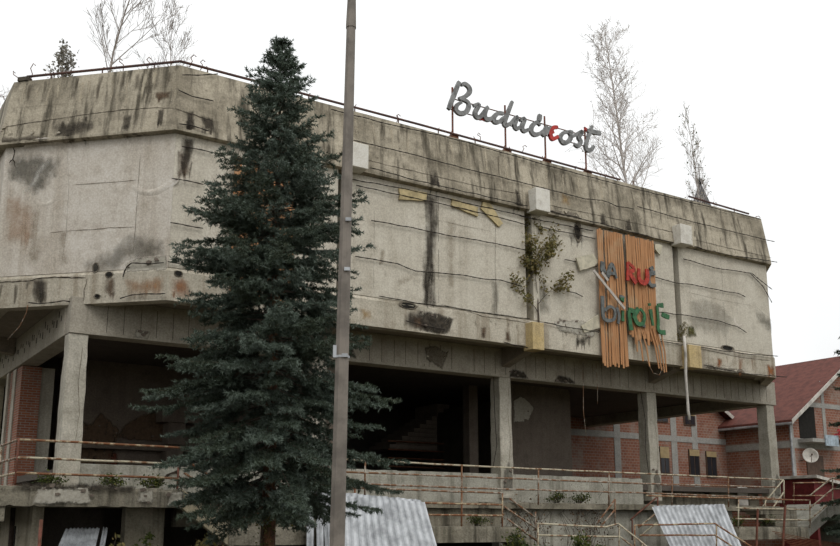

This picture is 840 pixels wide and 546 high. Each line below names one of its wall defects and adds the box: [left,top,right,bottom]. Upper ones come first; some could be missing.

water stain [58,117,93,135]
water stain [178,112,214,176]
water stain [11,158,53,189]
water stain [423,195,437,304]
water stain [408,313,438,326]
spalling [399,302,453,333]